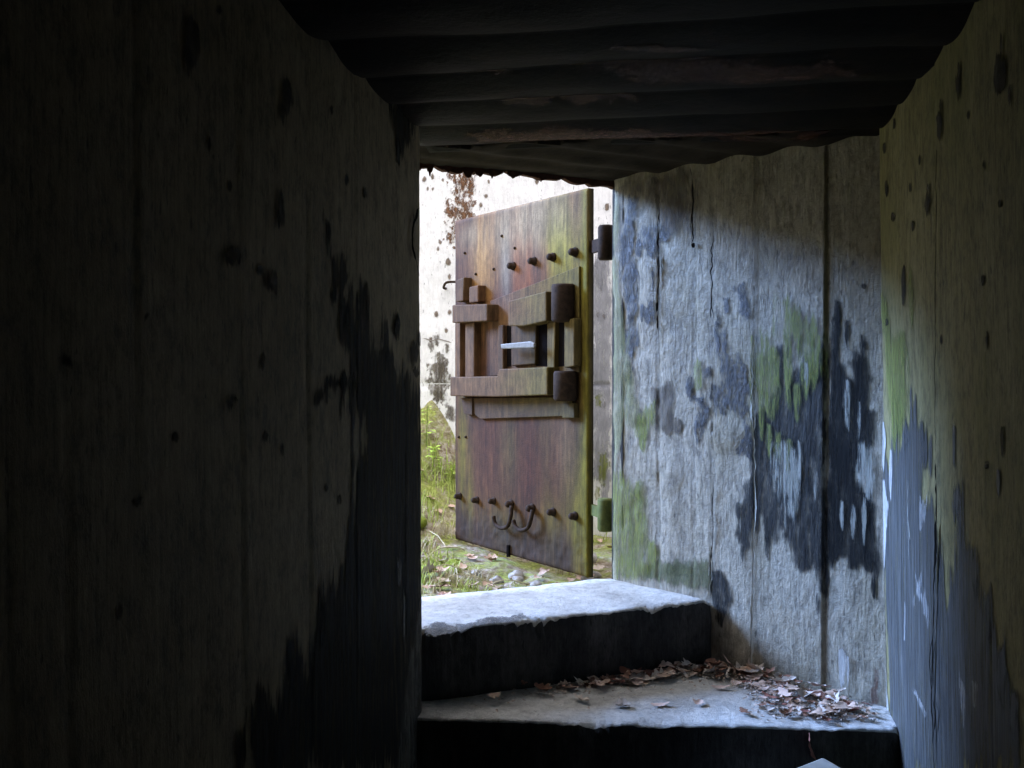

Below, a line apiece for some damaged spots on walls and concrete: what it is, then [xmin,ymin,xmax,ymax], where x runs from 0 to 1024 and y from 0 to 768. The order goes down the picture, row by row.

water stain [593,182,676,498]
crack [690,169,714,322]
water stain [709,570,731,627]
water stain [735,300,1022,768]